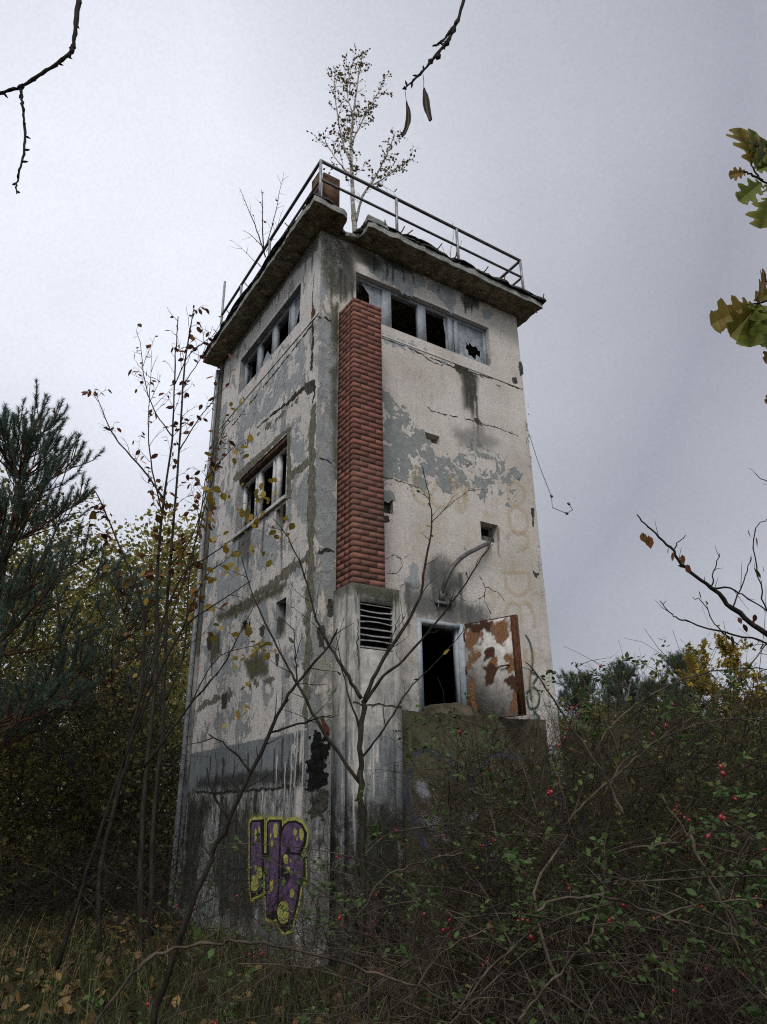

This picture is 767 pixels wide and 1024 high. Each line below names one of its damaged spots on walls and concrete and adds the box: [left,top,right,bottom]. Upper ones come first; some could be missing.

crack [382,337,519,389]
peeling [382,388,535,523]
damp [460,370,478,423]
crack [428,407,532,443]
peeling [203,322,338,709]
rust [464,618,521,715]
damp [197,718,305,835]
spalling [292,717,331,822]
damp [352,722,383,847]